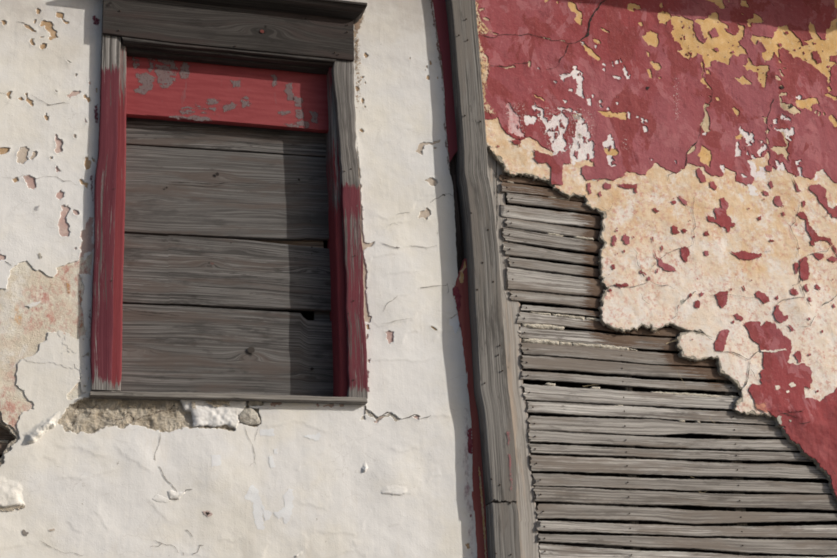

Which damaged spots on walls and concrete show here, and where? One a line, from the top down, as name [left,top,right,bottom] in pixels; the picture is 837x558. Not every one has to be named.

peeling [24,8,69,49]
crack [482,0,605,70]
peeling [56,191,80,237]
peeling [476,0,837,426]
peeling [0,217,282,441]
crack [361,405,431,423]
spalling [530,442,619,458]
spalling [634,434,723,463]
spalling [741,450,816,467]
spalling [531,471,620,490]
spalling [535,501,623,558]
spalling [746,508,837,527]